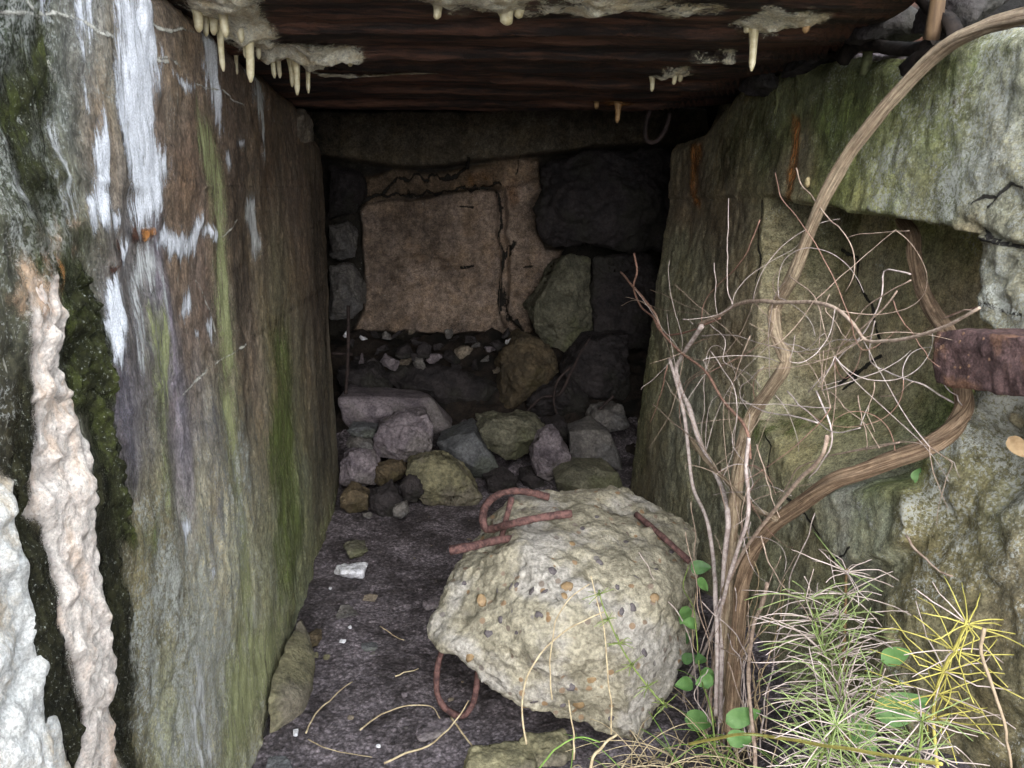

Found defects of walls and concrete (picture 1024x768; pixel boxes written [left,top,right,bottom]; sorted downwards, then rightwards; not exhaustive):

damp [74,0,93,56]
damp [423,0,728,26]
damp [649,49,735,92]
damp [734,5,833,71]
damp [47,117,76,224]
damp [84,0,437,372]
crack [329,155,533,332]
crack [971,182,1024,249]
damp [0,263,119,768]